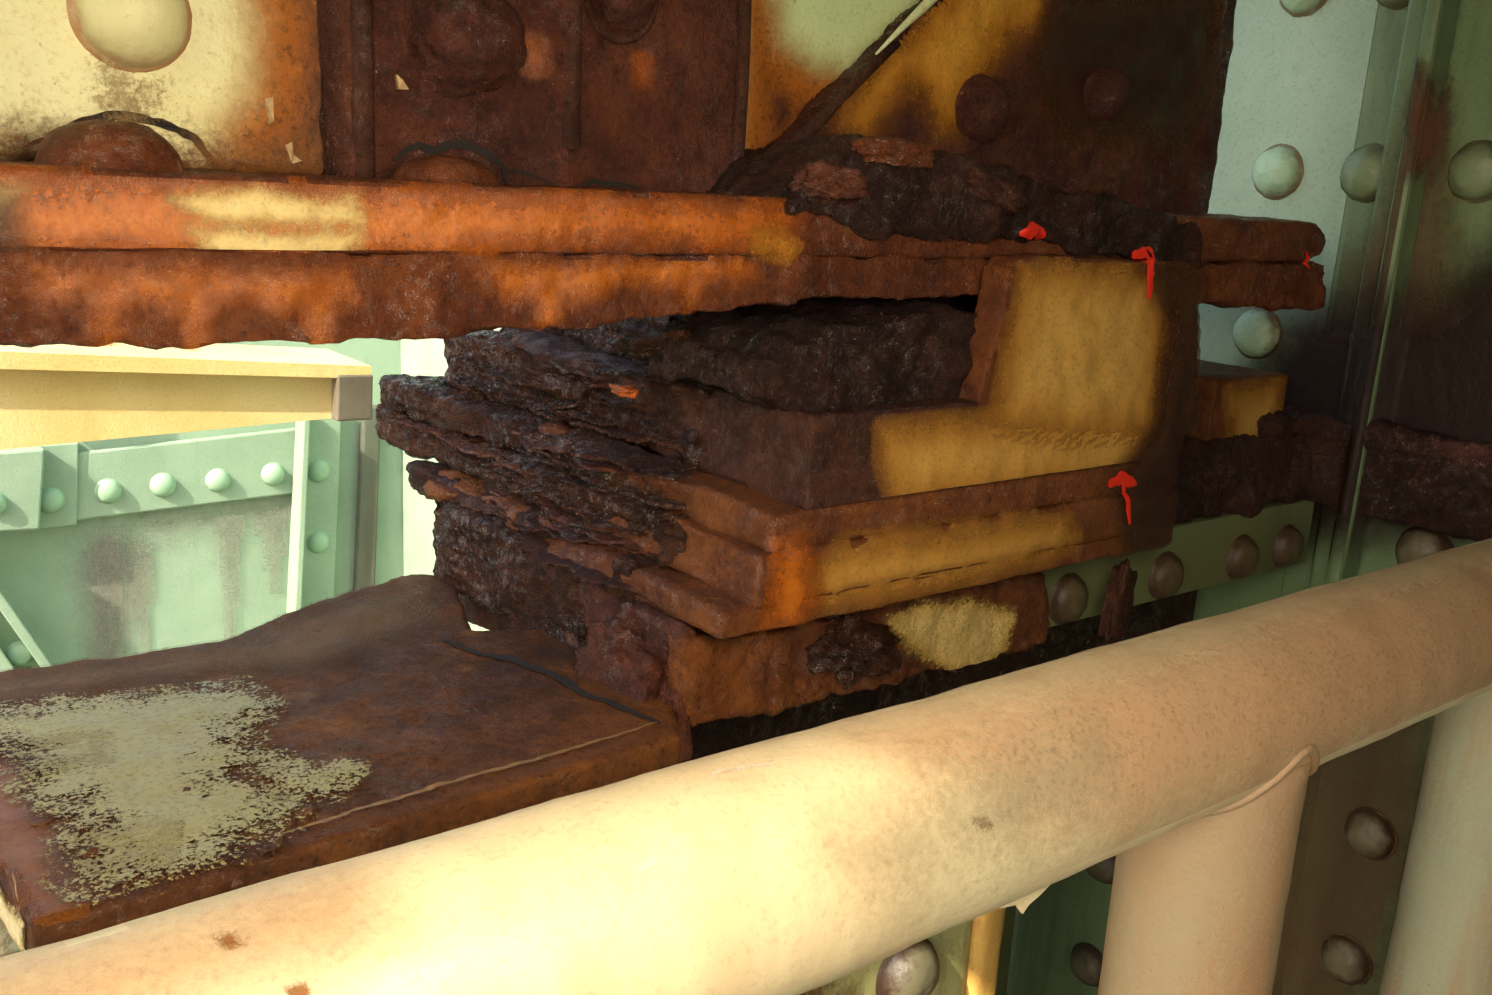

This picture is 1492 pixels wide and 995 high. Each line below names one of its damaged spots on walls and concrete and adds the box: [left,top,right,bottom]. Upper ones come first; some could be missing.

rust [745,0,839,150]
rust [0,0,804,699]
peeling [878,261,1166,496]
rust [1251,62,1492,543]
peeling [811,515,1077,670]
rust [0,757,107,942]
rust [214,934,244,949]